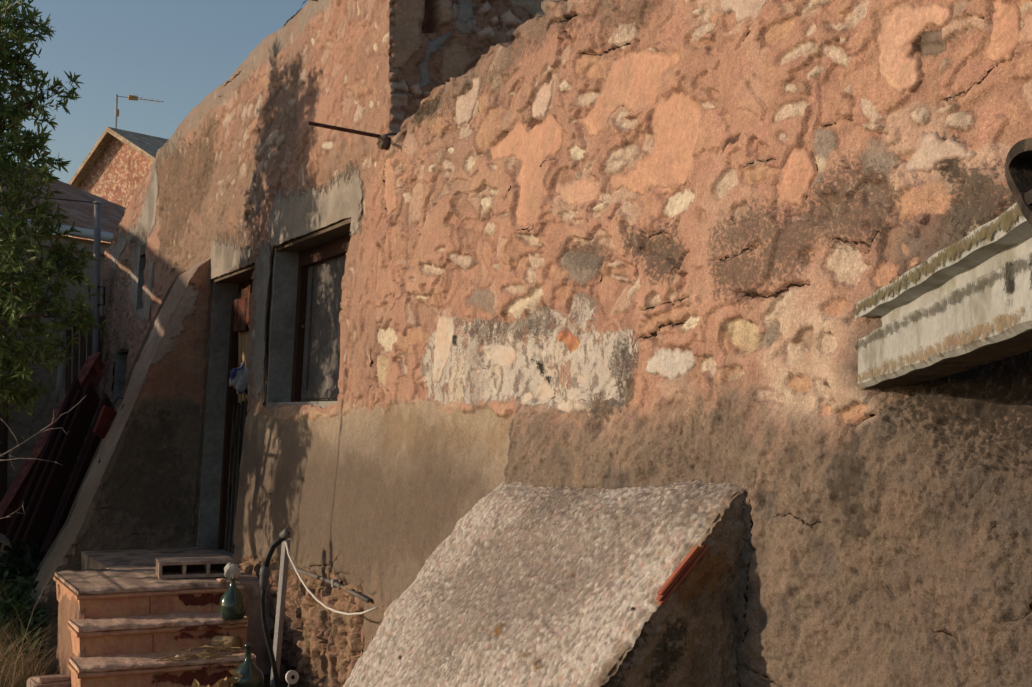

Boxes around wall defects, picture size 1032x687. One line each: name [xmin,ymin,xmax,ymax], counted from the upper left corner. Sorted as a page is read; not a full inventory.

crack [743,283,811,298]
peeling [420,292,696,414]
crack [736,499,822,687]